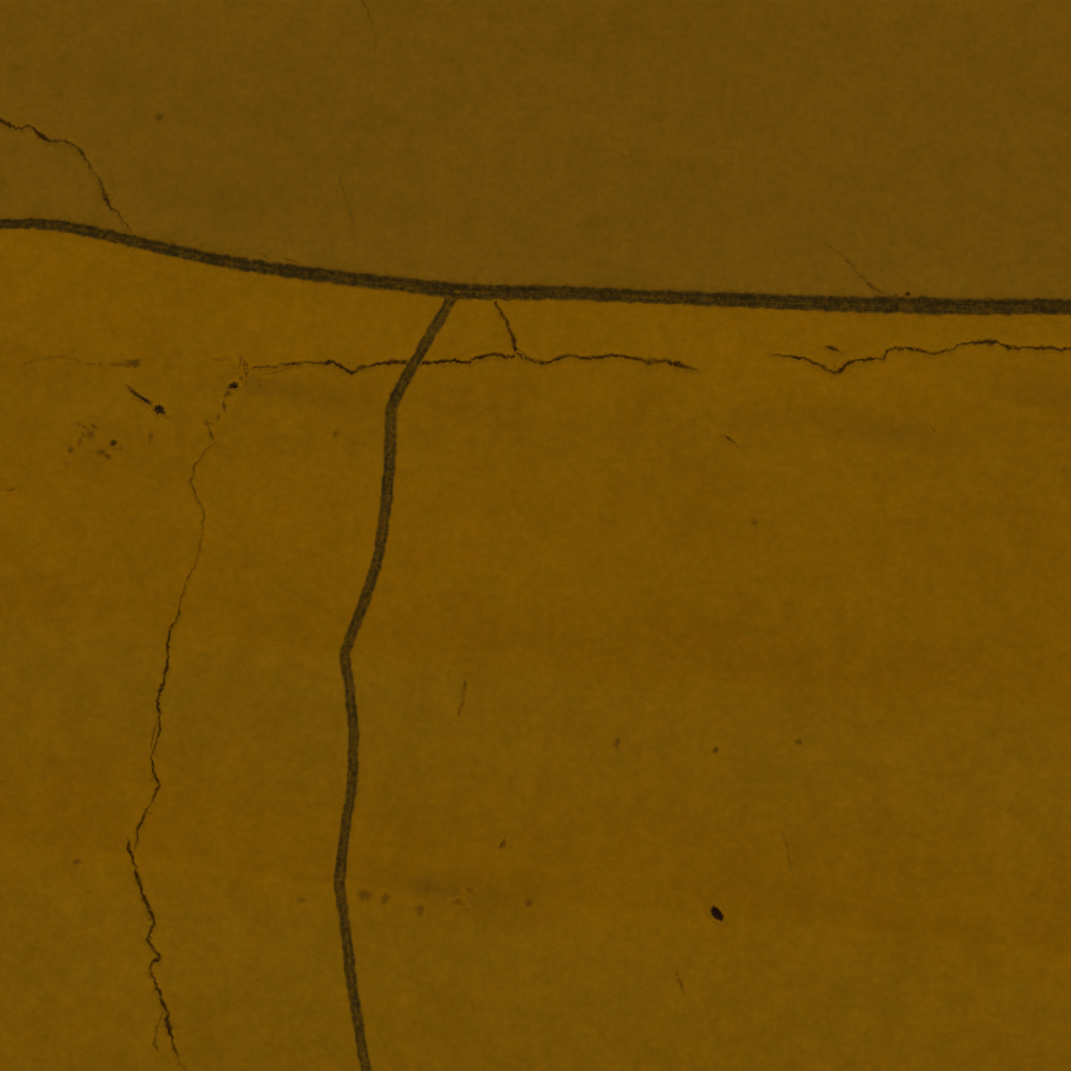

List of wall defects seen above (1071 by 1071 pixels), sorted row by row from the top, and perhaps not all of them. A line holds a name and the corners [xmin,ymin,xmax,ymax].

crack [0,114,136,234]
crack [235,280,704,379]
crack [765,333,1071,380]
crack [123,440,216,1071]